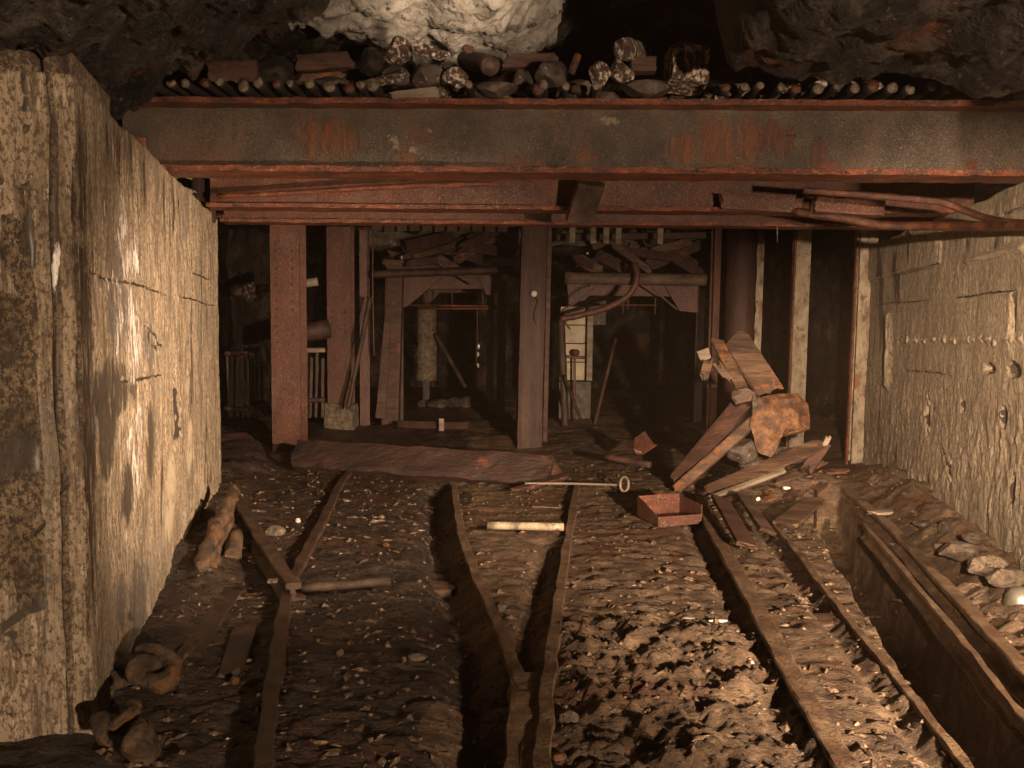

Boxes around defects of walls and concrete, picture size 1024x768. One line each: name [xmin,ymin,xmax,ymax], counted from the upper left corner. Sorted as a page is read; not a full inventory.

crack [91,273,214,306]